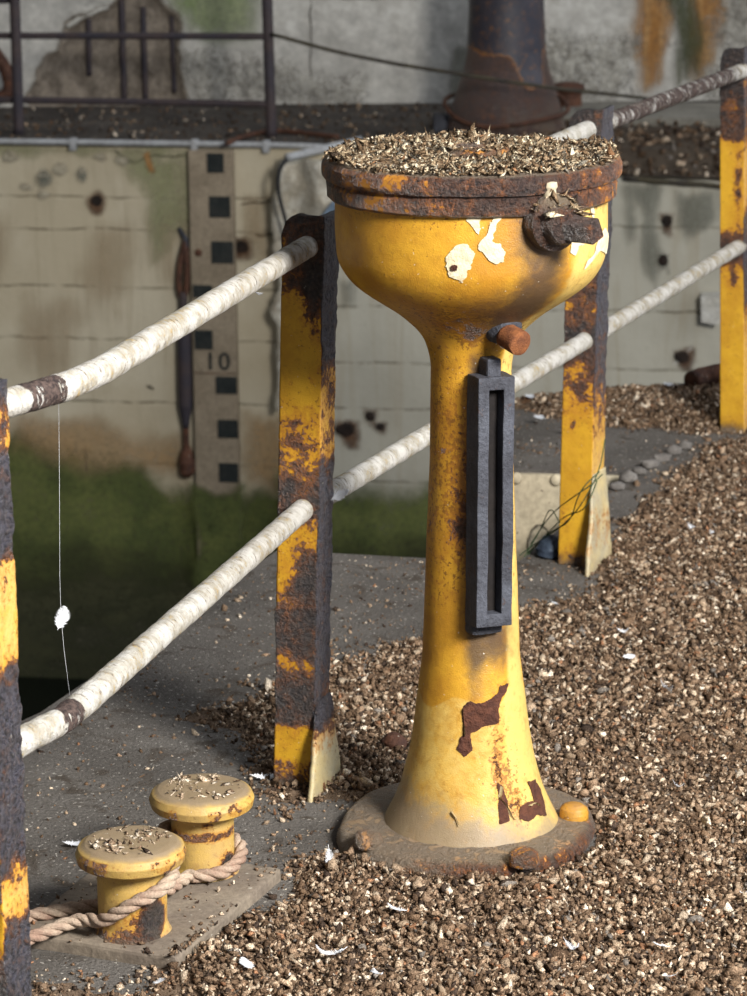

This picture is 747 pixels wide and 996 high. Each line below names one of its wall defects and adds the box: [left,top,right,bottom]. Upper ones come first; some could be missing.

spalling [25,0,367,107]
corrosion [635,0,727,90]
peeling [445,218,506,283]
peeling [571,228,609,270]
corrosion [335,411,386,448]
leakage [16,560,199,679]